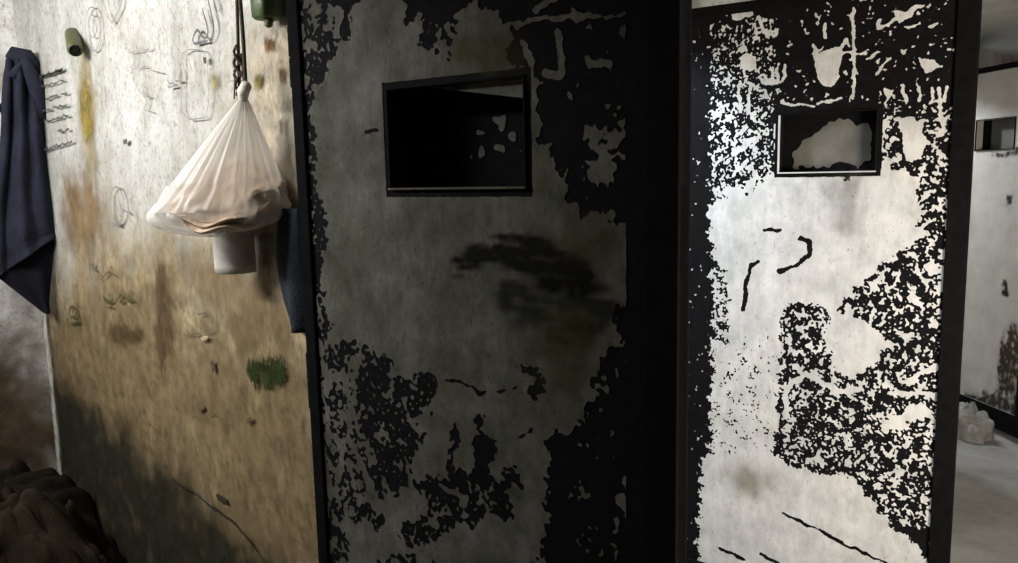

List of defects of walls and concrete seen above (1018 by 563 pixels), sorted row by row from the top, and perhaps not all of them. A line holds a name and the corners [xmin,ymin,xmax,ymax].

rust [83,54,94,122]
leakage [250,18,298,209]
leakage [47,234,311,434]
peeling [300,0,626,563]
peeling [687,0,955,563]
leakage [0,333,270,563]
crack [171,478,265,563]